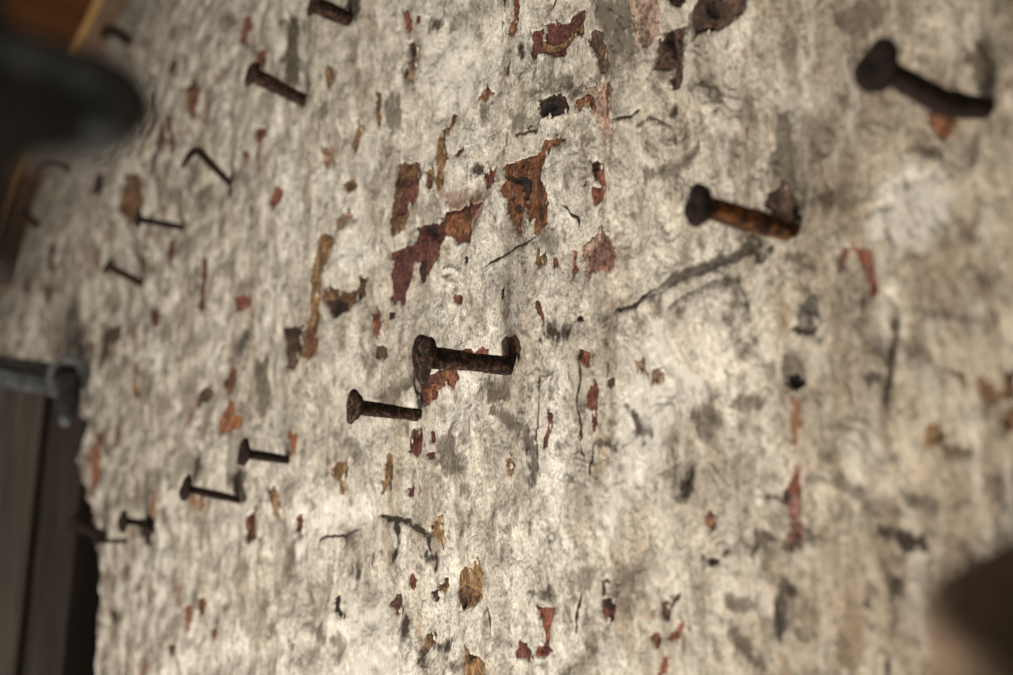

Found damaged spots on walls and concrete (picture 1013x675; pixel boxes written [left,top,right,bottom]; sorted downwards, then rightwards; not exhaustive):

peeling [529,10,613,140]
peeling [627,0,747,92]
peeling [481,138,565,235]
peeling [283,207,368,374]
peeling [371,198,483,363]
crack [483,237,535,268]
peeling [572,221,616,283]
crack [615,242,766,312]
crack [576,355,594,480]
crack [318,515,434,563]
peeling [431,557,483,612]